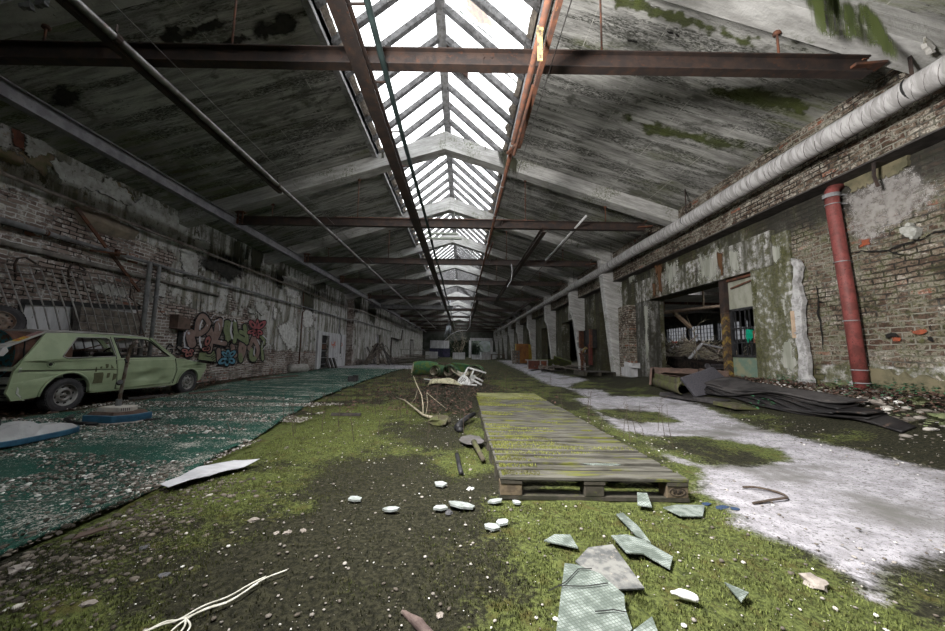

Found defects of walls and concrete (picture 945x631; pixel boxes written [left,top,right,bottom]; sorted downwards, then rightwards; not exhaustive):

water stain [158,15,225,43]
water stain [220,12,299,44]
water stain [806,0,897,58]
peeling [844,155,911,193]
flaking render [0,128,210,279]
flaking render [247,273,314,350]
water stain [781,339,798,371]